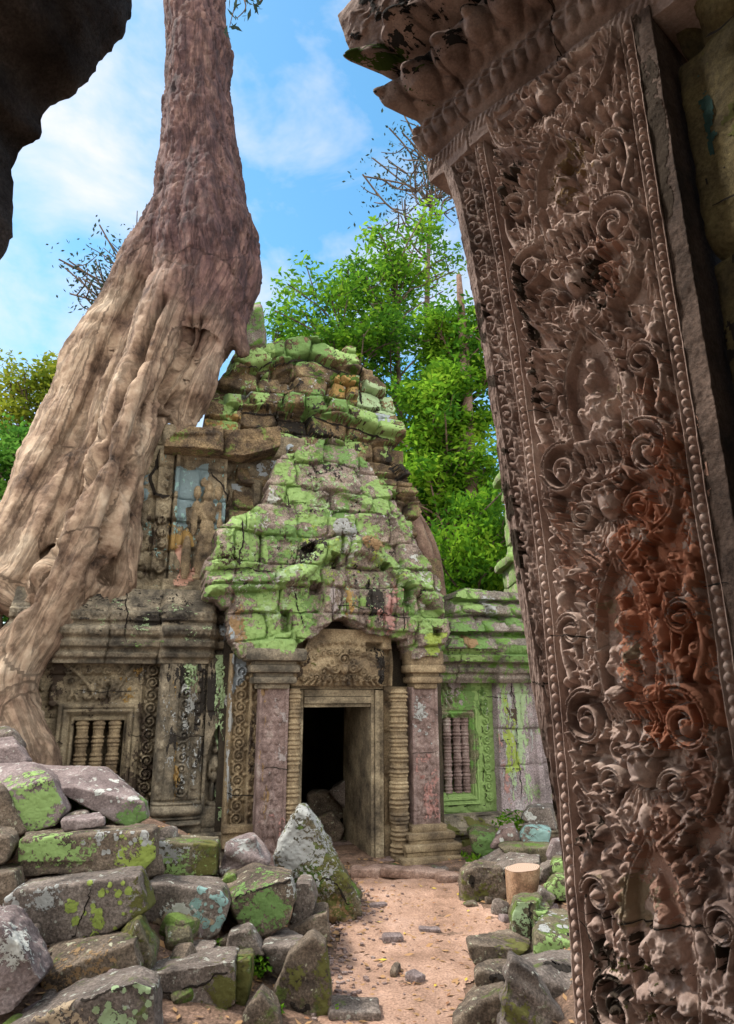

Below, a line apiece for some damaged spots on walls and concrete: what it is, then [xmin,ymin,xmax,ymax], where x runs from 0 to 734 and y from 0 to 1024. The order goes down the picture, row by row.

damp [475,302,492,351]
spalling [167,463,242,551]
crack [221,520,272,572]
damp [500,447,527,584]
damp [45,662,217,802]